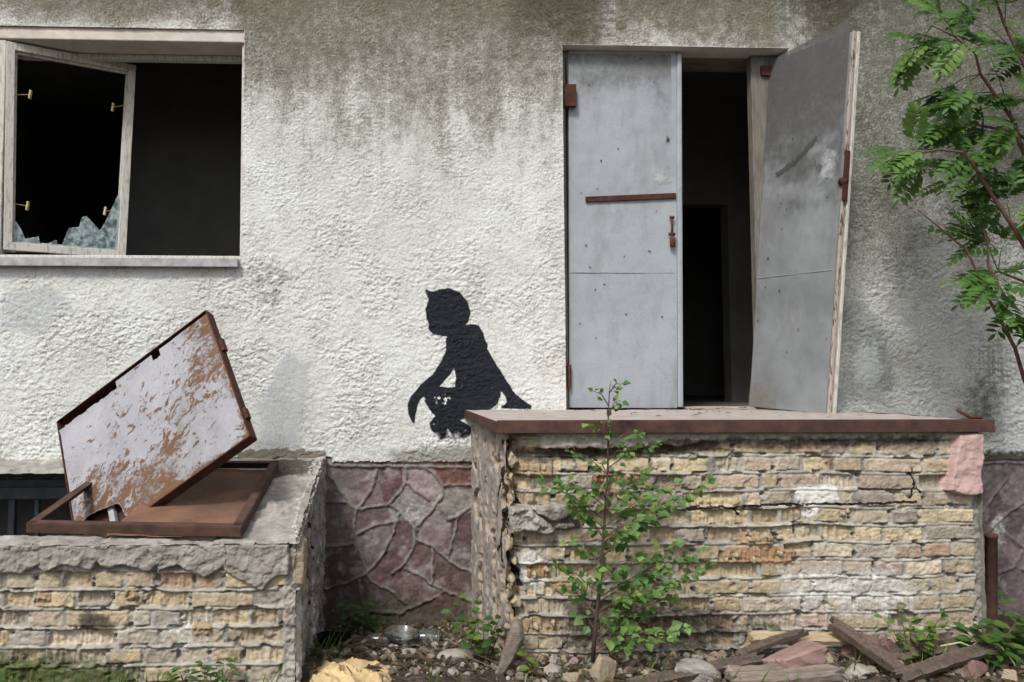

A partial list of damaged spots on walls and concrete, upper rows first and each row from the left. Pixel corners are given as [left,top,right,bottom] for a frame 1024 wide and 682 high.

leakage [0,0,1024,270]
corrosion [69,314,248,521]
spalling [516,462,553,478]
leakage [790,482,840,518]
flaking render [506,503,578,535]
spalling [526,563,578,593]
flaking render [0,532,317,682]
spalling [524,615,562,633]